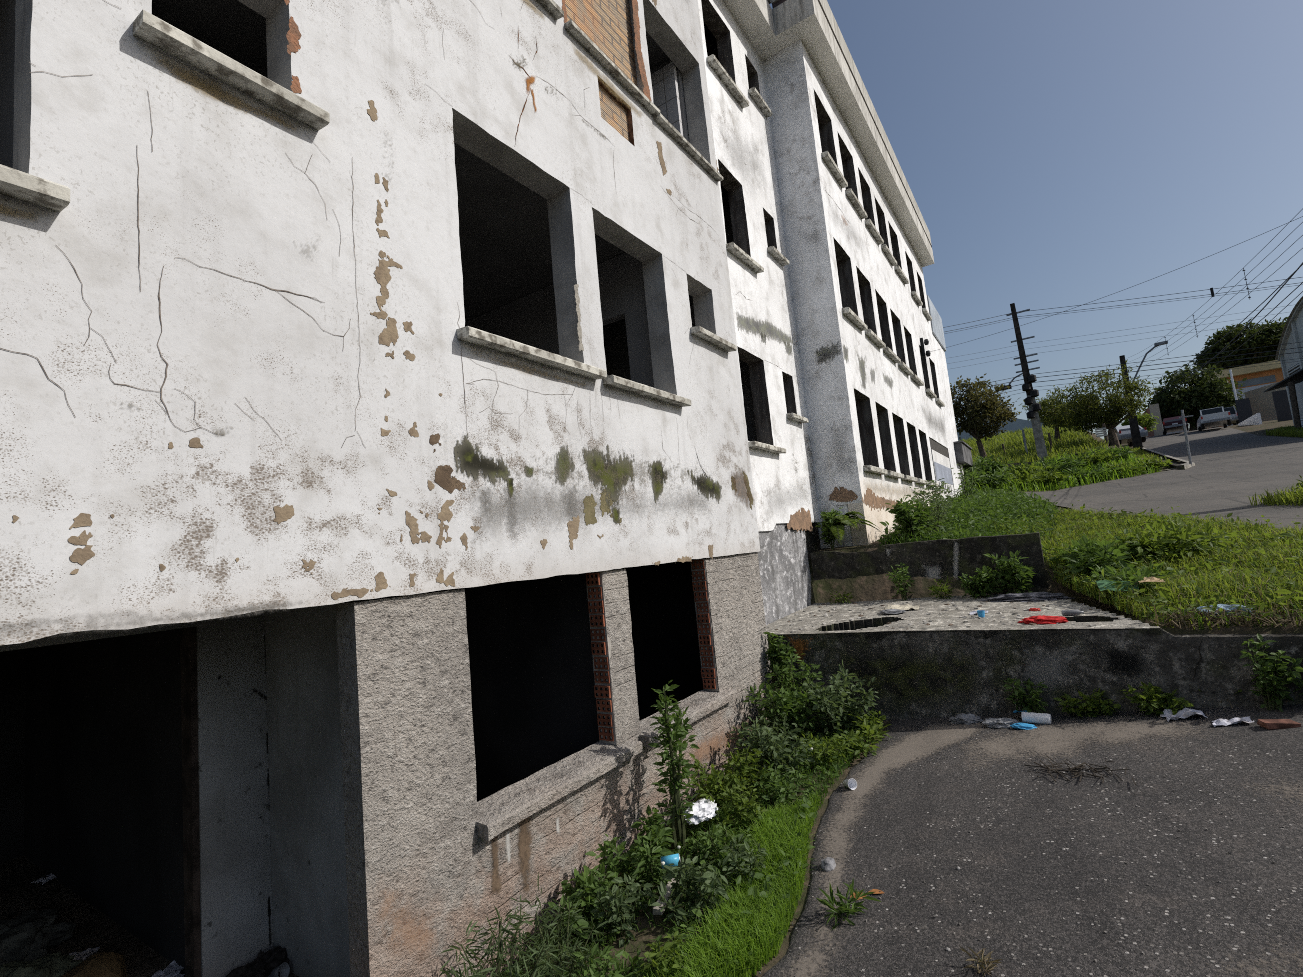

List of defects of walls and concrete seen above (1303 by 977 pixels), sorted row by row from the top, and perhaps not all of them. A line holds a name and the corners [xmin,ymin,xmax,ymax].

flaking render [284,0,302,55]
crack [470,0,616,200]
crack [56,94,366,448]
peeling [369,173,415,361]
crack [0,348,76,418]
peeling [68,513,95,574]
peeling [400,422,480,550]
water stain [507,466,534,497]
water stain [732,472,751,506]
flaking render [787,508,813,532]
flaking render [829,487,916,512]
peeling [436,568,455,587]